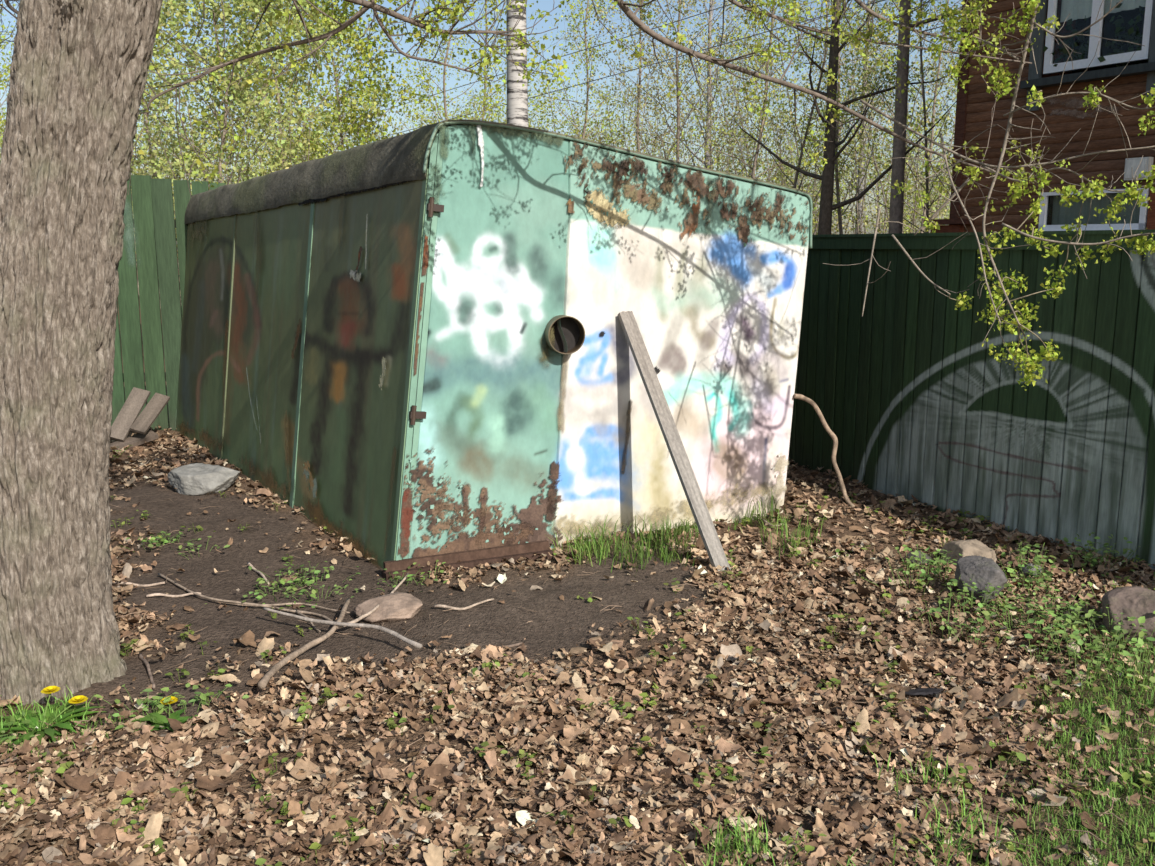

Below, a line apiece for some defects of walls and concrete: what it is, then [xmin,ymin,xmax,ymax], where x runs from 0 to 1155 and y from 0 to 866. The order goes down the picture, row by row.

rust [567,173,591,213]
rust [602,153,793,247]
rust [300,500,379,568]
rust [398,461,563,558]